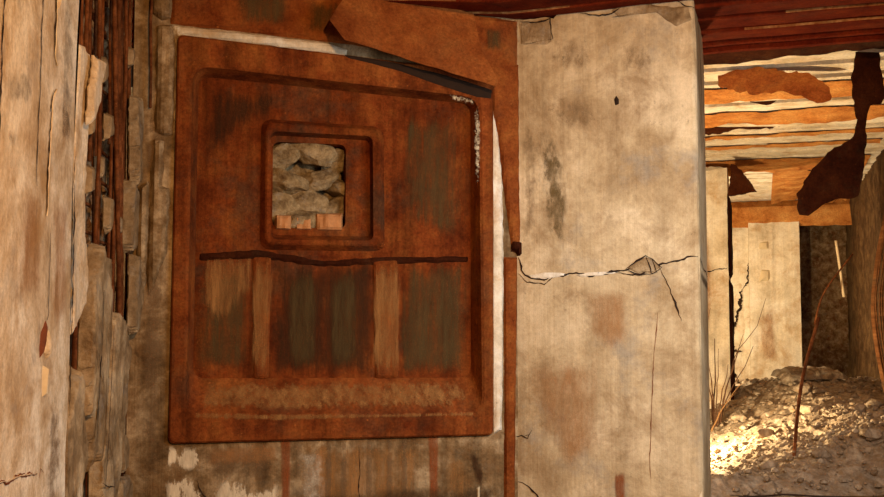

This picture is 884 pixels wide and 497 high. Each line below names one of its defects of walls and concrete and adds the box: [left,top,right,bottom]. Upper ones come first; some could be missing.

crack [0,0,8,127]
crack [36,0,58,216]
spalling [65,0,176,497]
corrosion [206,262,230,313]
corrosion [374,274,399,366]
crack [518,255,749,475]
crack [0,469,44,485]